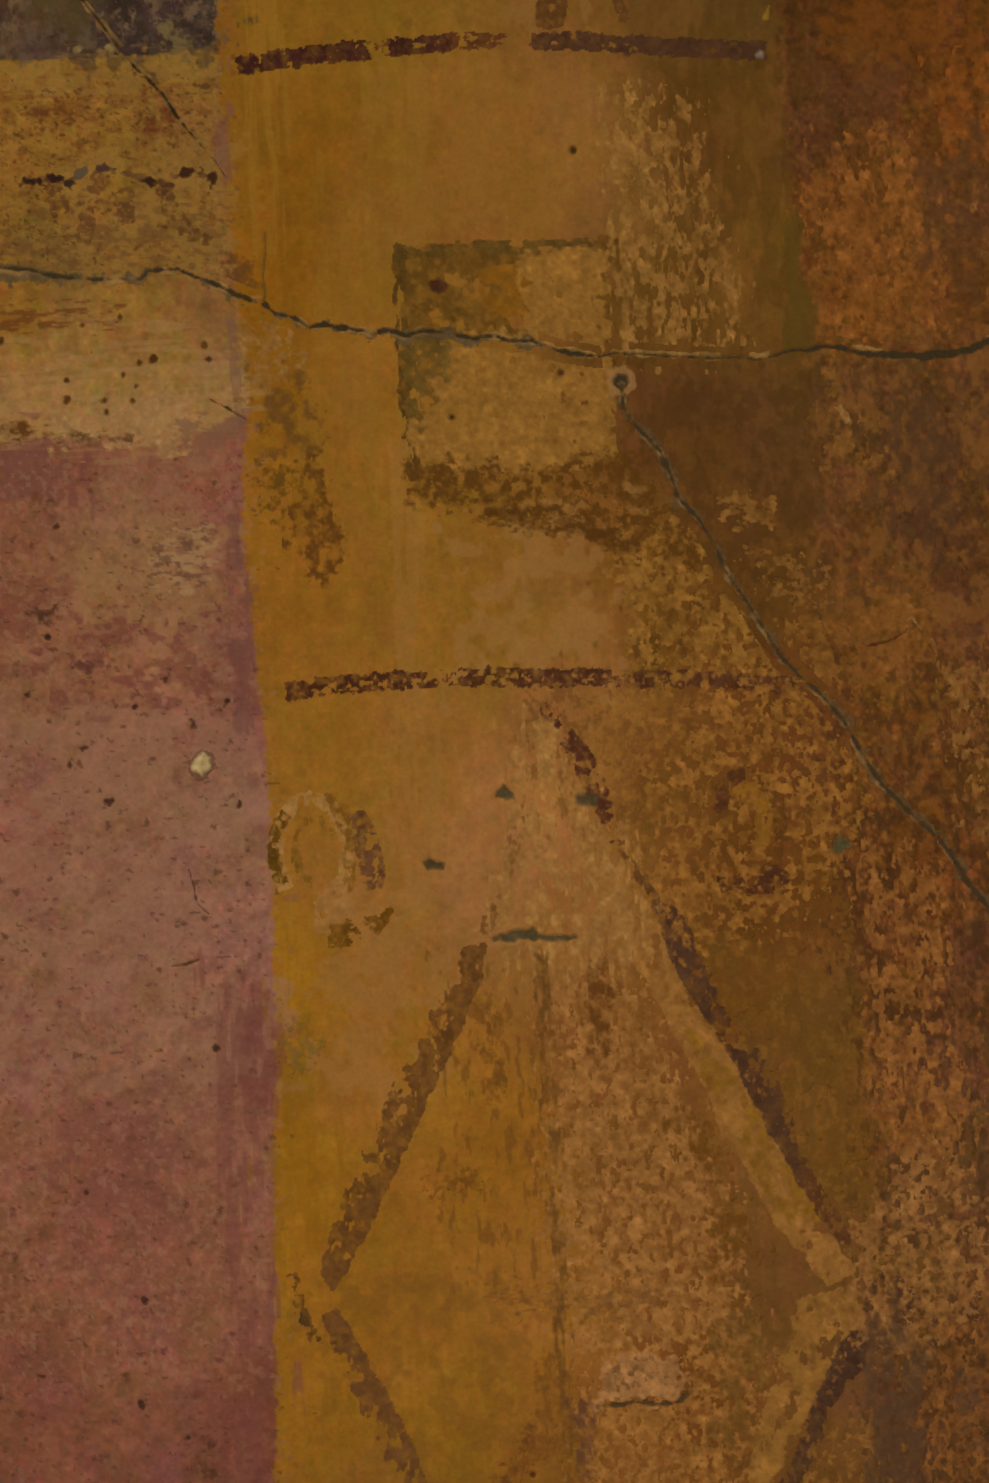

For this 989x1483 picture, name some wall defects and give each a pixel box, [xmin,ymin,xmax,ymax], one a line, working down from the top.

crack [79,0,226,176]
crack [0,231,989,915]
crack [171,959,200,967]